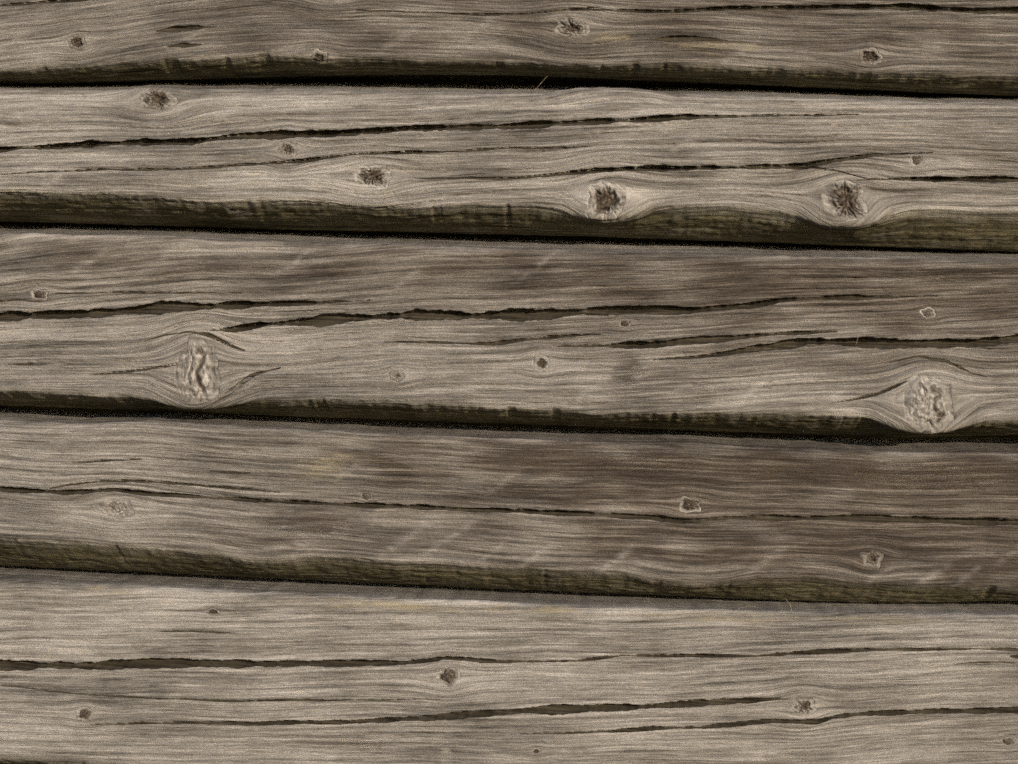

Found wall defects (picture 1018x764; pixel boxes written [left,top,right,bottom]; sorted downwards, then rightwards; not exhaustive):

crack [0,113,1018,183]
crack [0,291,1018,407]
crack [158,627,232,635]
crack [0,648,1018,735]